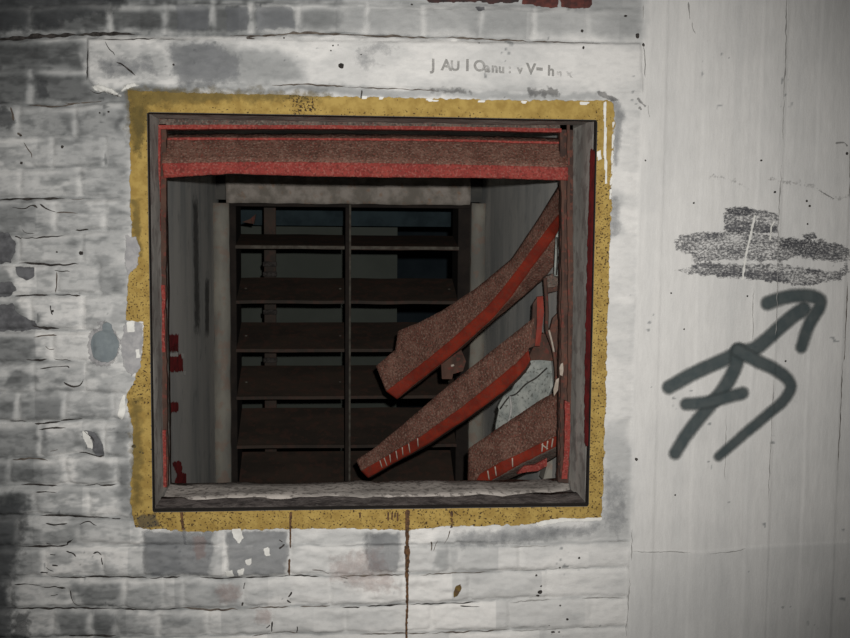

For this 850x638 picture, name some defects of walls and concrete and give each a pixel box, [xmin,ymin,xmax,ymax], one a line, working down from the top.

peeling [120,321,144,376]
peeling [117,395,126,419]
corrosion [387,510,410,638]